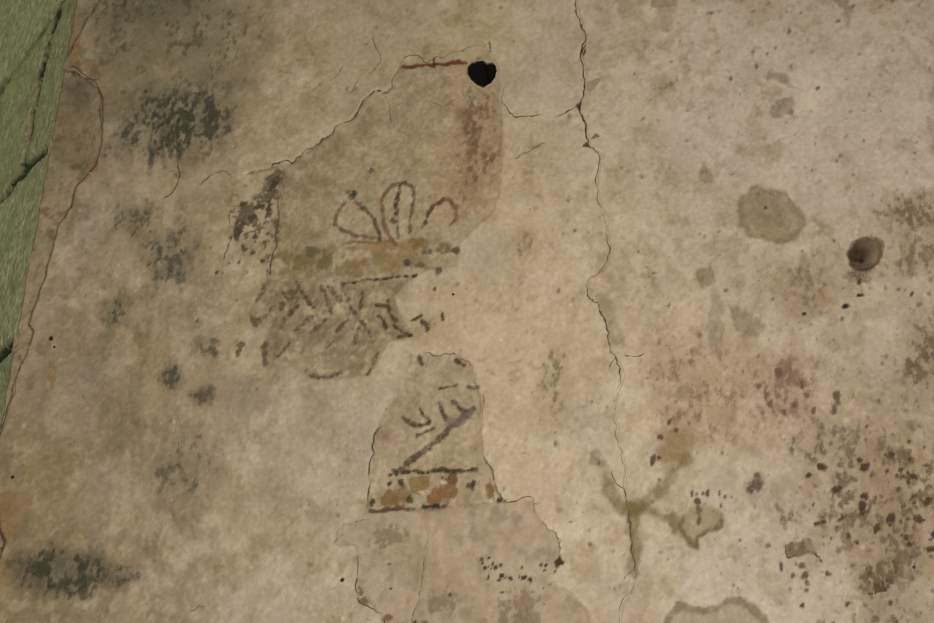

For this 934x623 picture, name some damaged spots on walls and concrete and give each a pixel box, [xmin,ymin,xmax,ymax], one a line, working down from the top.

damp [103,0,251,164]
crack [164,39,442,198]
crack [565,0,644,622]
damp [650,385,718,497]
damp [757,359,810,415]
spalling [847,238,884,297]
damp [906,328,934,383]
damp [18,548,139,599]
peeling [336,496,589,623]
damp [669,490,726,549]
damp [664,597,767,623]
damp [806,423,934,607]